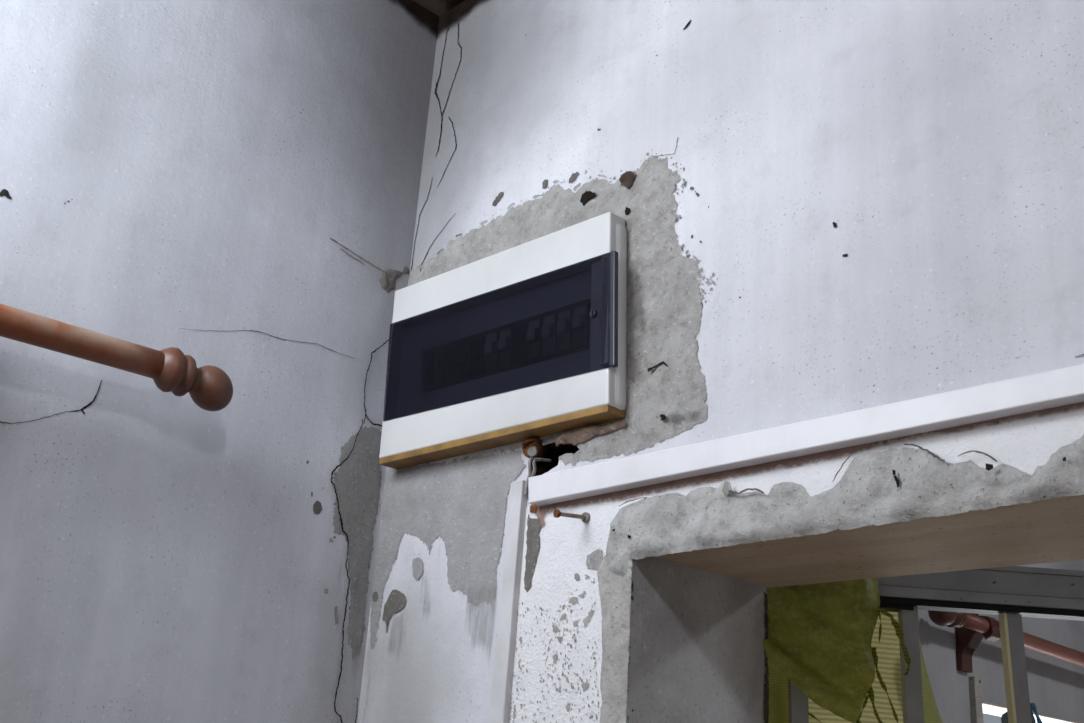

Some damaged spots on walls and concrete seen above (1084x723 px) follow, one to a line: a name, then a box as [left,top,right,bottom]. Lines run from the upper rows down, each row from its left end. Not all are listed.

crack [411,23,462,272]
crack [0,380,102,424]
flaking render [311,149,718,660]
flaking render [508,515,603,723]